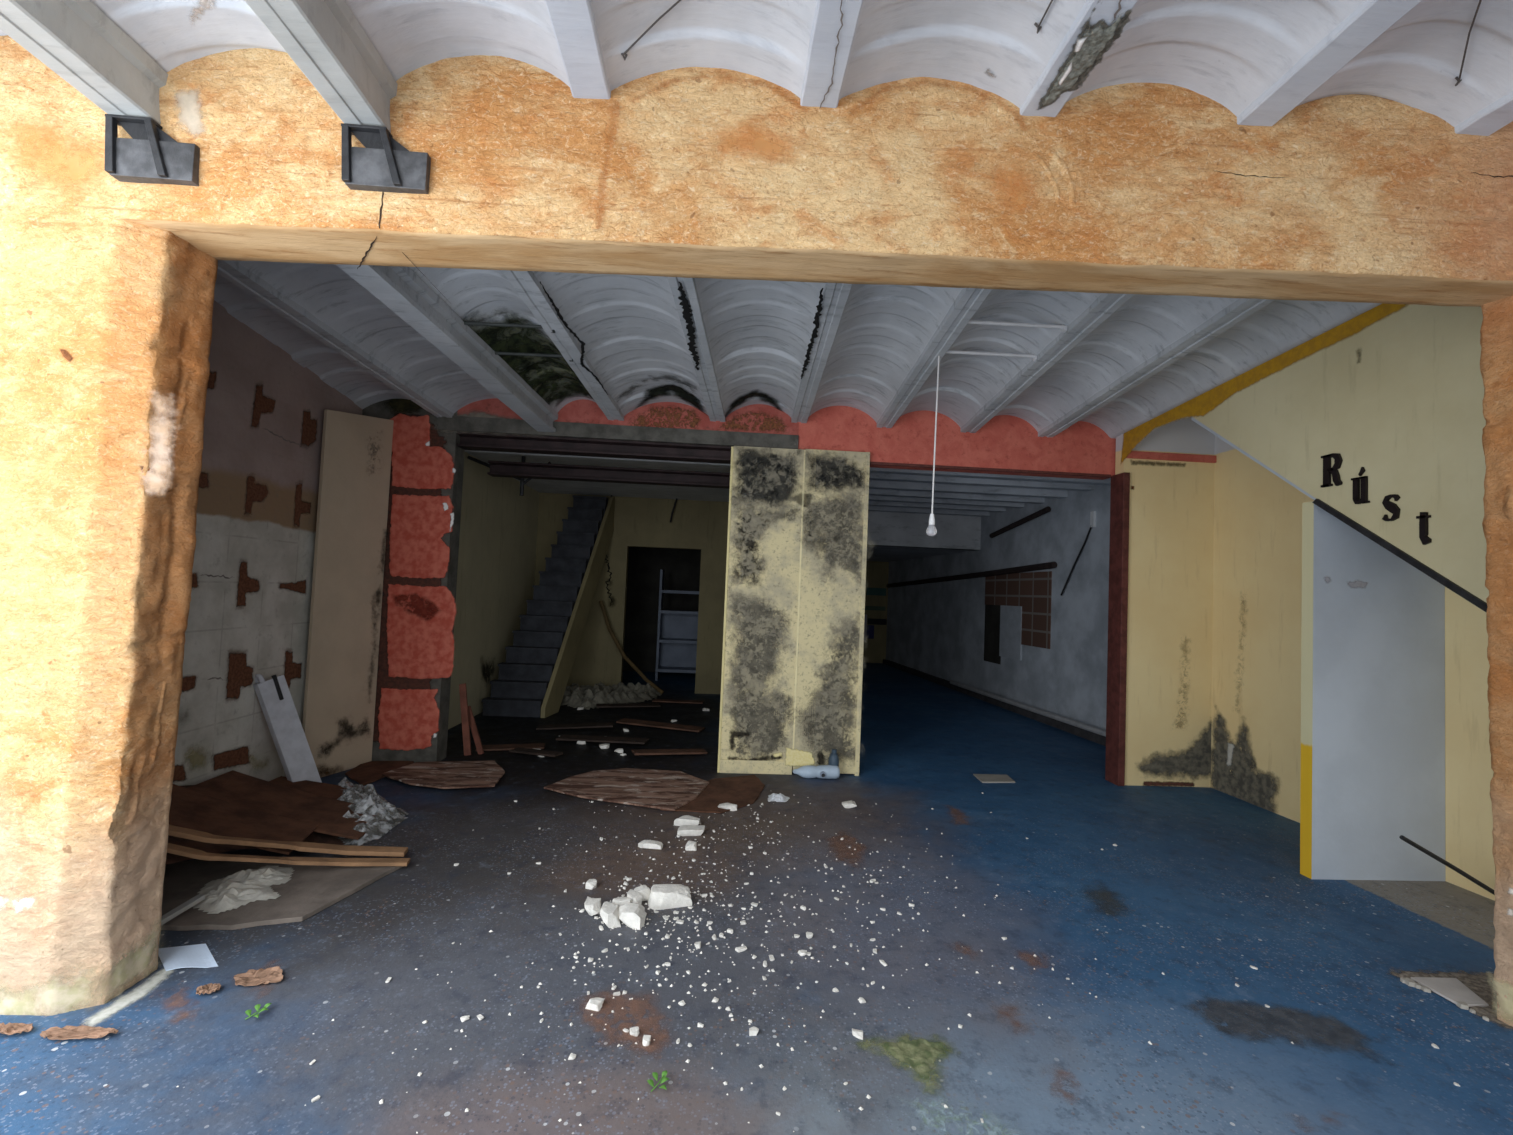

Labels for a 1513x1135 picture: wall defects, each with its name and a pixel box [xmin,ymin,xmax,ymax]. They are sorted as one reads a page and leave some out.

spalling [1038,0,1132,110]
crack [357,192,443,295]
crack [540,281,608,395]
crack [677,282,700,370]
crack [801,288,823,379]
flaking render [373,413,457,751]
damp [728,449,863,765]
damp [1139,714,1278,812]